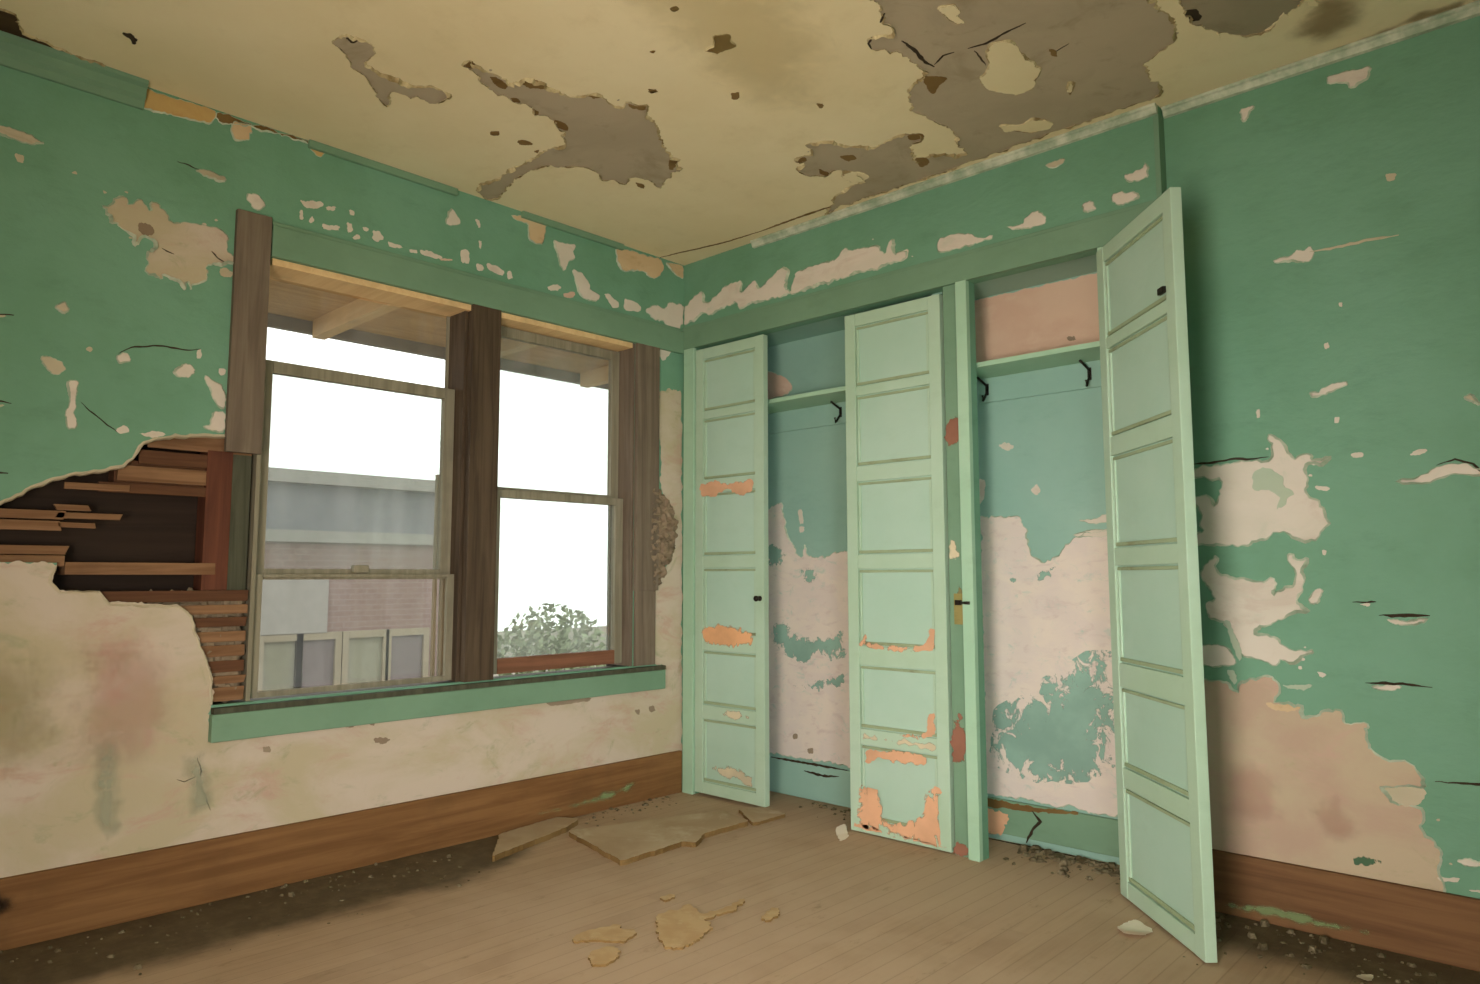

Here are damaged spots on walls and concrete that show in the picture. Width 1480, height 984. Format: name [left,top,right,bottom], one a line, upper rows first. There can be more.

peeling [462,60,683,201]
peeling [794,0,1319,215]
peeling [511,215,913,328]
peeling [975,273,1100,363]
peeling [0,345,754,878]
peeling [701,502,936,769]
peeling [979,479,1118,836]
peeling [1194,434,1480,893]
crack [1356,601,1430,626]
crack [1368,681,1432,691]
crack [989,811,1107,864]
crack [1435,779,1480,787]